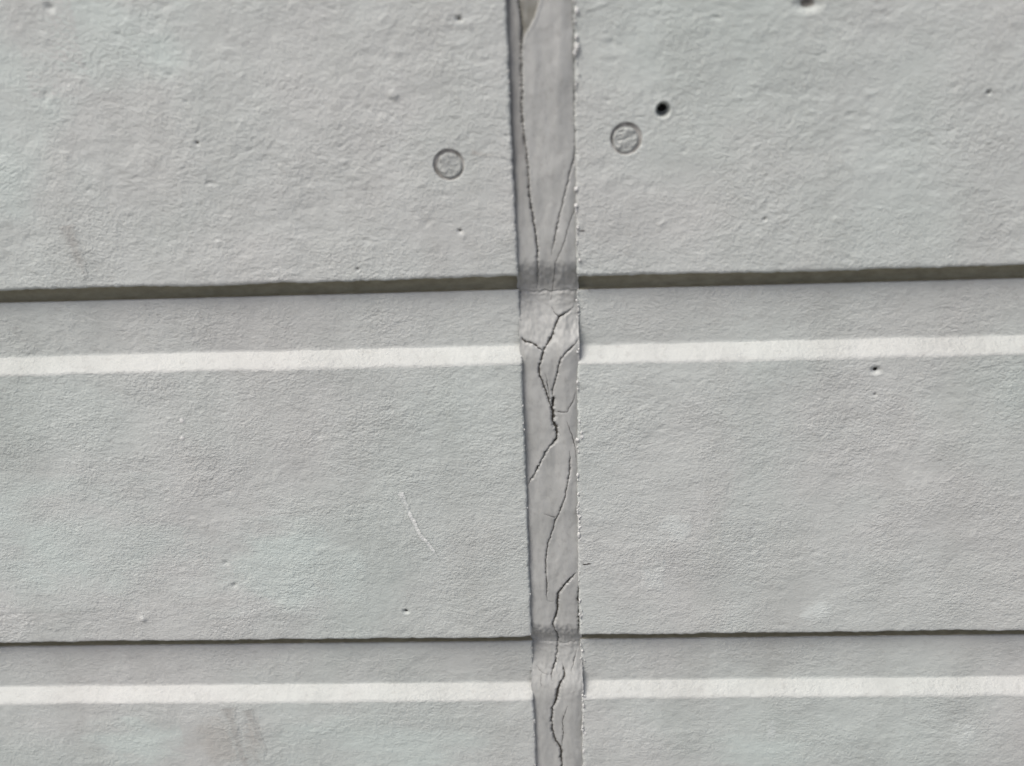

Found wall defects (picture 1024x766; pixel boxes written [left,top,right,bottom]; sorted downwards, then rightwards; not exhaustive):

crack [518,0,579,766]